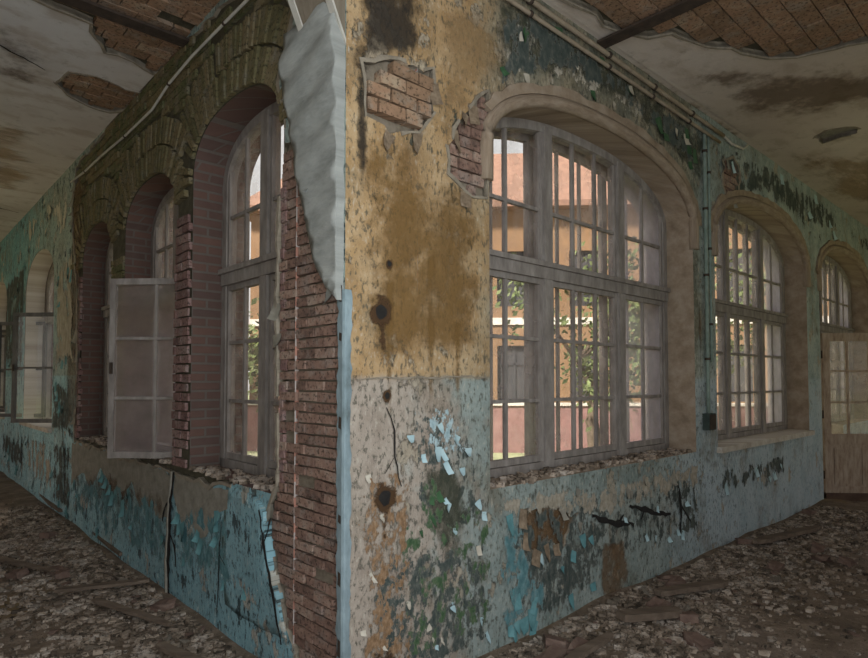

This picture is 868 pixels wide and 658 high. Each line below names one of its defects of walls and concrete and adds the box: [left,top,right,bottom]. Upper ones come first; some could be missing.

flaking render [359,55,444,154]
peeling [500,9,698,169]
flaking render [559,0,682,32]
flaking render [632,0,868,60]
leakage [749,78,868,110]
leakage [357,0,478,358]
peeling [3,0,346,658]
crack [162,471,176,594]
crack [258,510,282,645]
peeling [356,409,699,658]
peeling [721,452,784,495]